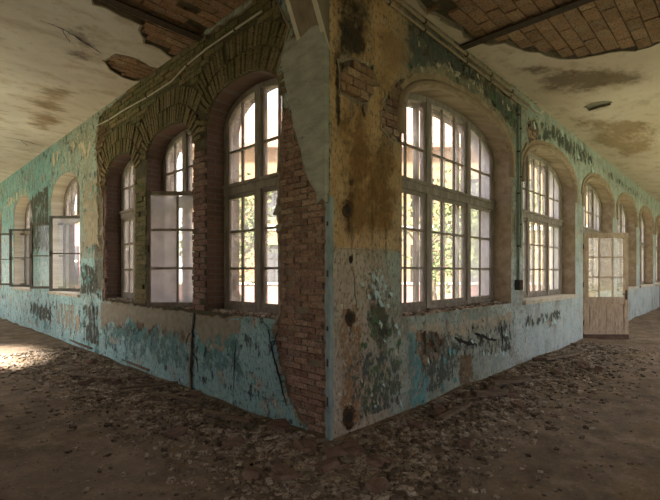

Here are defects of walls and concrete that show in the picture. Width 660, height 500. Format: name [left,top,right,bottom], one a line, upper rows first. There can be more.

crack [40,20,100,53]
damp [339,0,369,55]
spalling [416,0,660,60]
peeling [408,29,515,127]
damp [547,71,636,89]
damp [336,63,396,239]
peeling [7,182,50,255]
peeling [30,0,380,437]
crack [186,313,198,390]
crack [267,329,287,405]
peeling [336,268,512,425]
peeling [525,310,561,331]